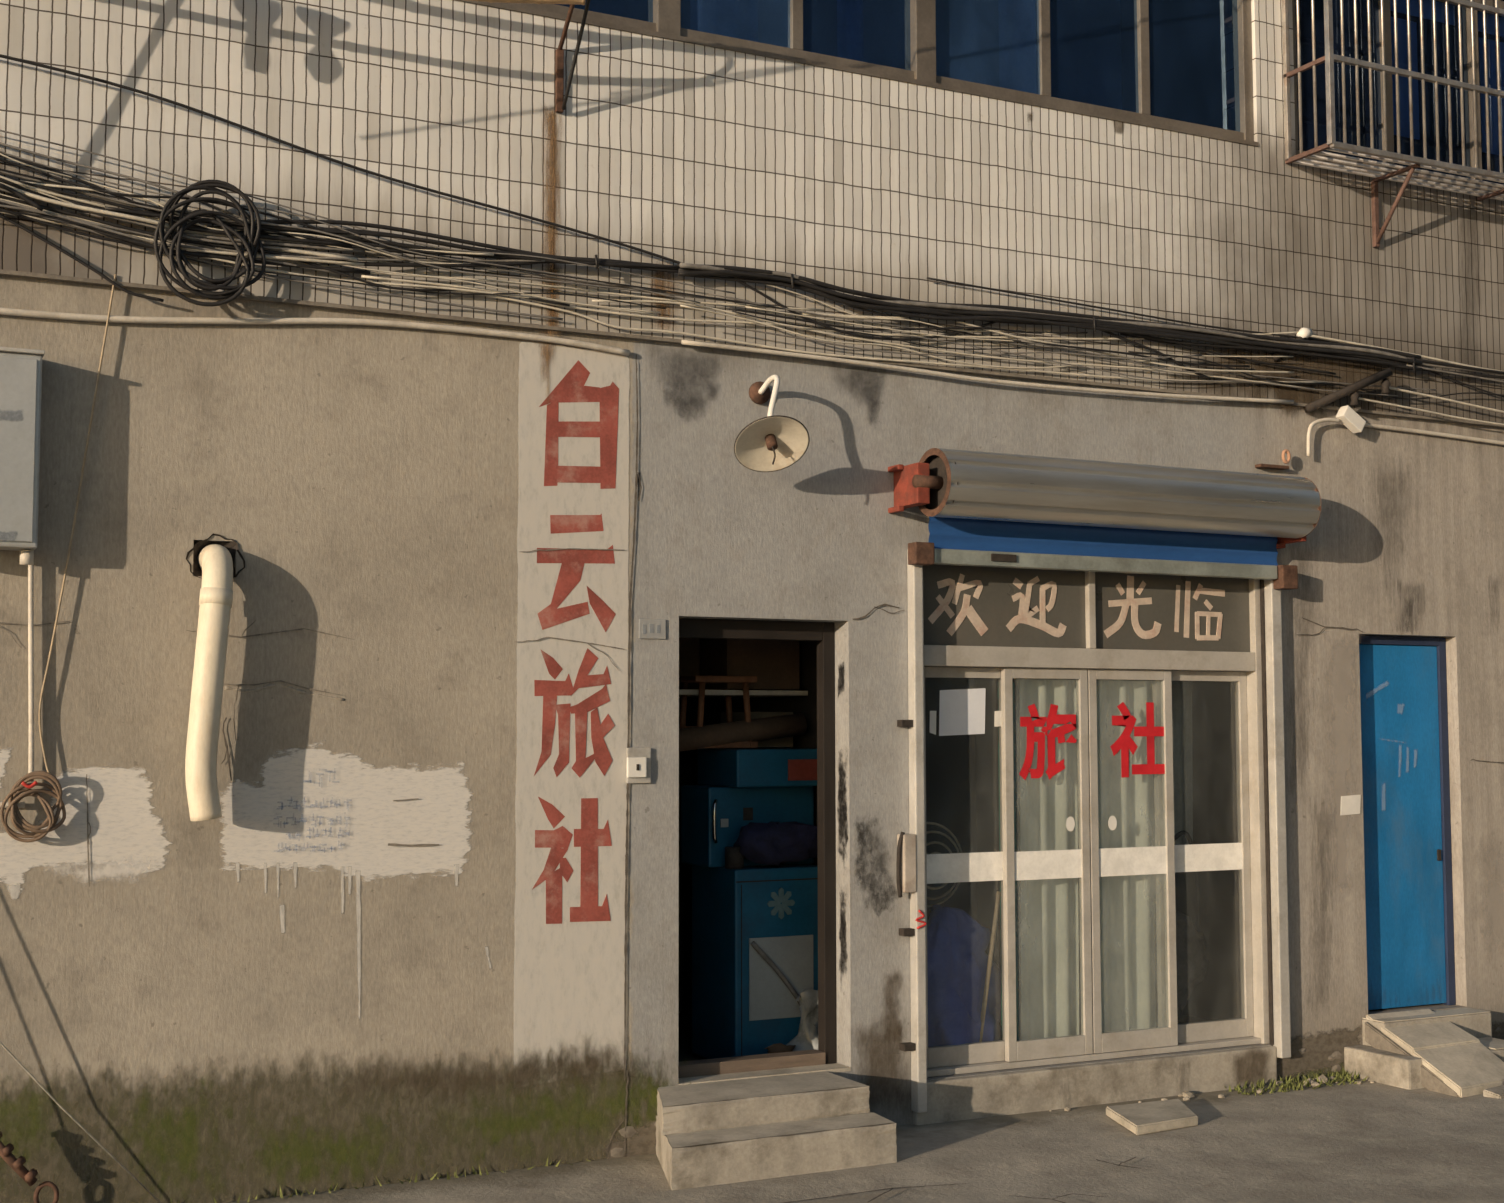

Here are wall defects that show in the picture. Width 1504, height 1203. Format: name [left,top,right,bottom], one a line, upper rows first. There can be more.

rust [543,110,559,365]